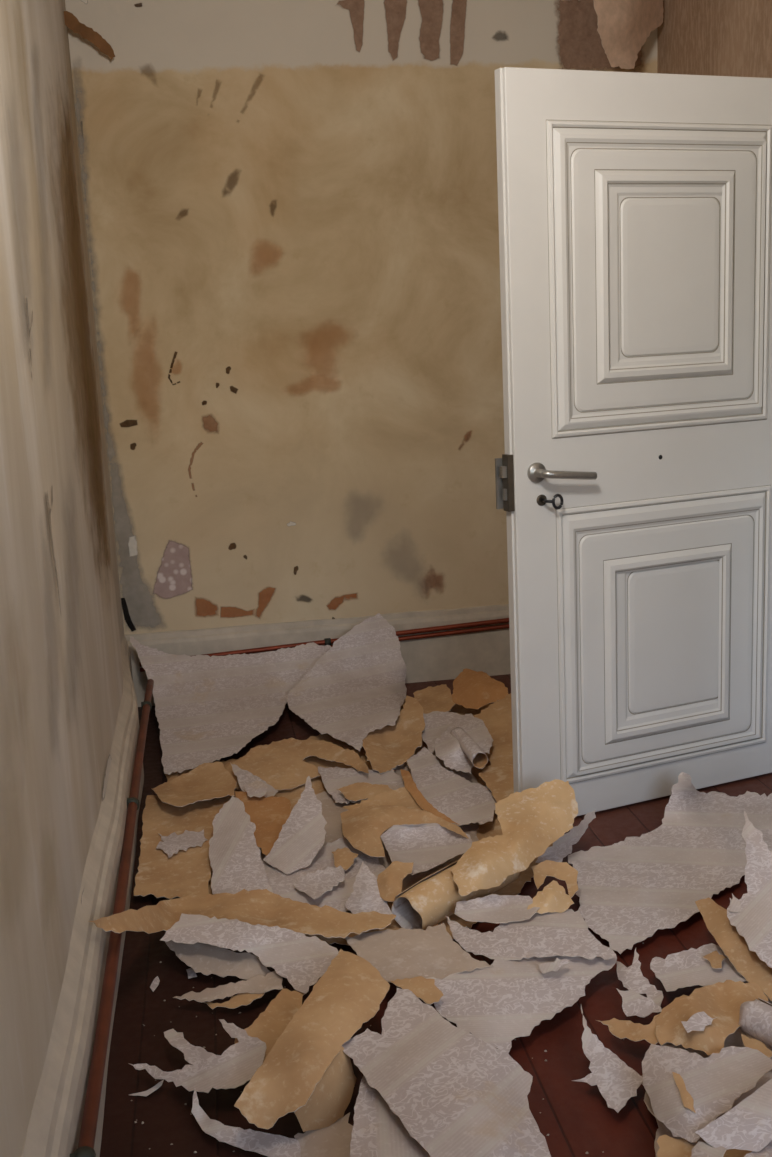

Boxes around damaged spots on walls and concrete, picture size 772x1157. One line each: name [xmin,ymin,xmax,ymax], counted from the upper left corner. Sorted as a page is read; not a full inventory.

peeling [337,0,364,52]
peeling [384,0,443,61]